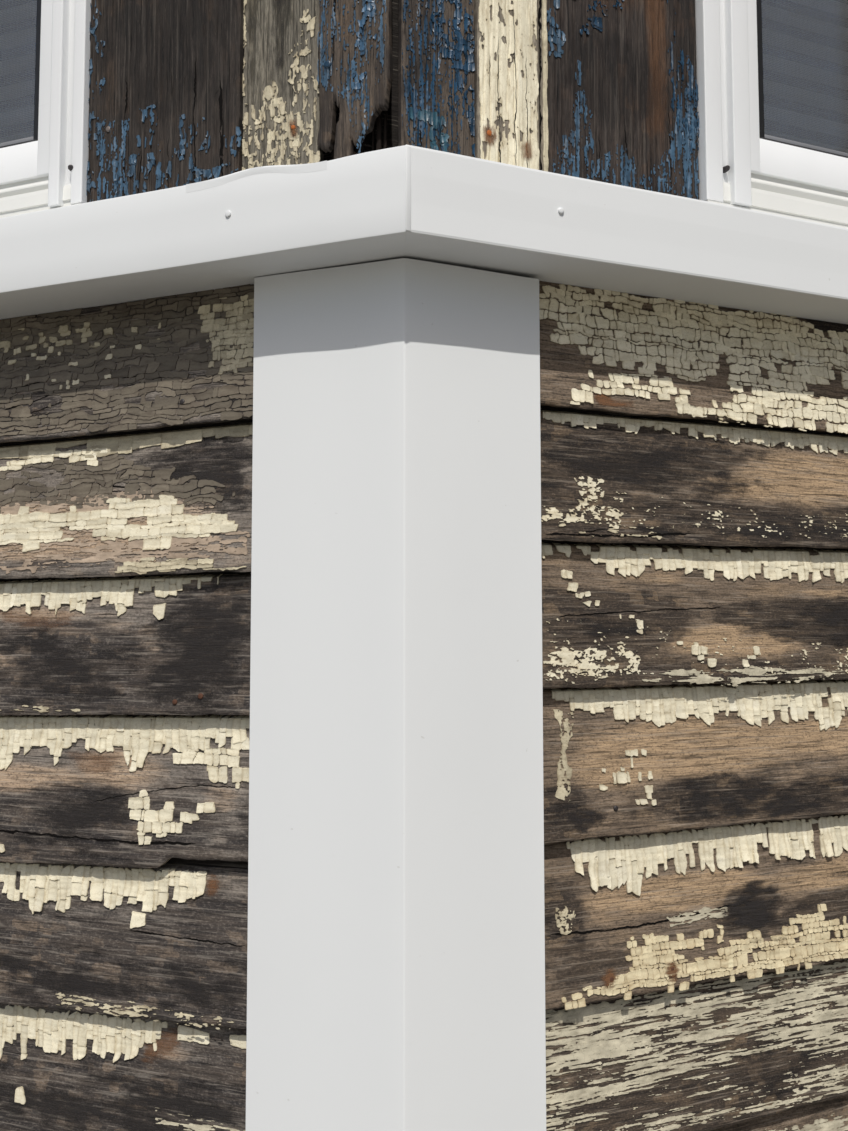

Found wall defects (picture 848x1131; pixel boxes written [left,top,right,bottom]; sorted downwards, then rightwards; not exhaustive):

peeling [86,0,387,202]
peeling [402,0,700,200]
peeling [0,284,254,620]
peeling [539,284,848,455]
peeling [541,476,848,607]
peeling [0,705,250,789]
peeling [543,614,848,806]
peeling [0,844,207,928]
peeling [566,814,848,896]
peeling [0,993,246,1063]
peeling [545,904,848,1131]